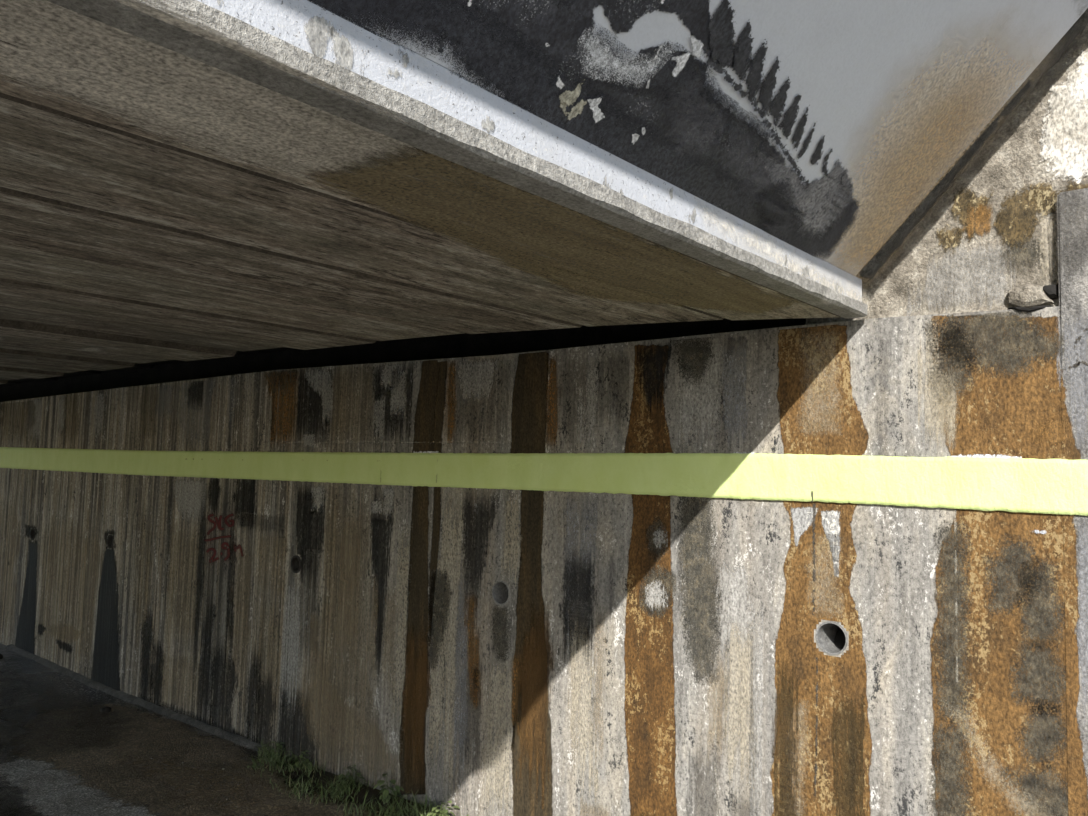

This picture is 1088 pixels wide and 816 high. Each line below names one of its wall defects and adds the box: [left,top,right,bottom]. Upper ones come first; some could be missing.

peeling [304,16,366,73]
leakage [0,0,800,316]
peeling [389,51,414,78]
peeling [556,77,605,123]
leakage [510,352,548,454]
rust [777,324,869,456]
rust [924,311,1081,460]
leakage [370,486,598,816]
rust [624,494,677,816]
leakage [677,496,763,816]
rust [770,501,872,816]
rust [925,509,1088,816]